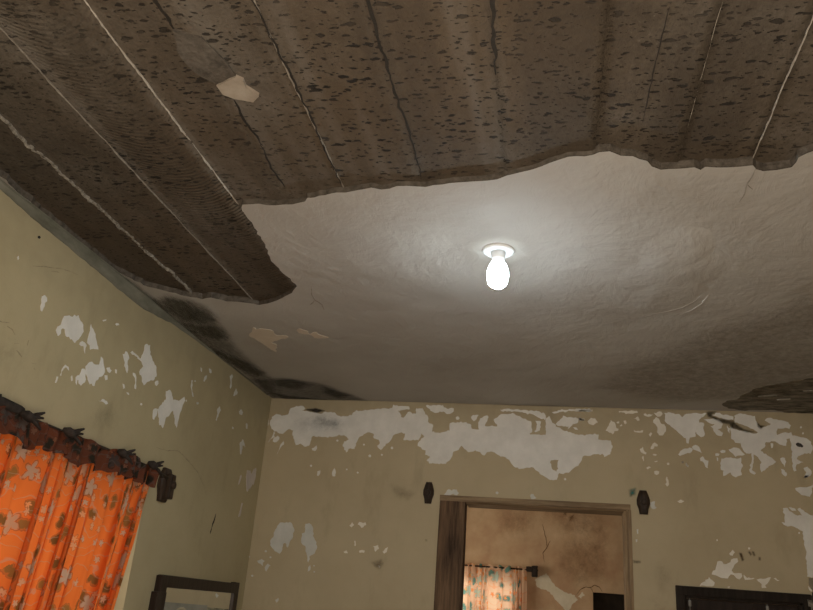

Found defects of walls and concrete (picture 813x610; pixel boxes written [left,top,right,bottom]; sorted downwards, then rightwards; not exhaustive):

spalling [0,0,813,301]
peeling [55,315,159,395]
water stain [159,299,347,413]
peeling [152,368,212,428]
peeling [268,378,813,497]
peeling [249,522,317,573]
peeling [782,507,813,590]